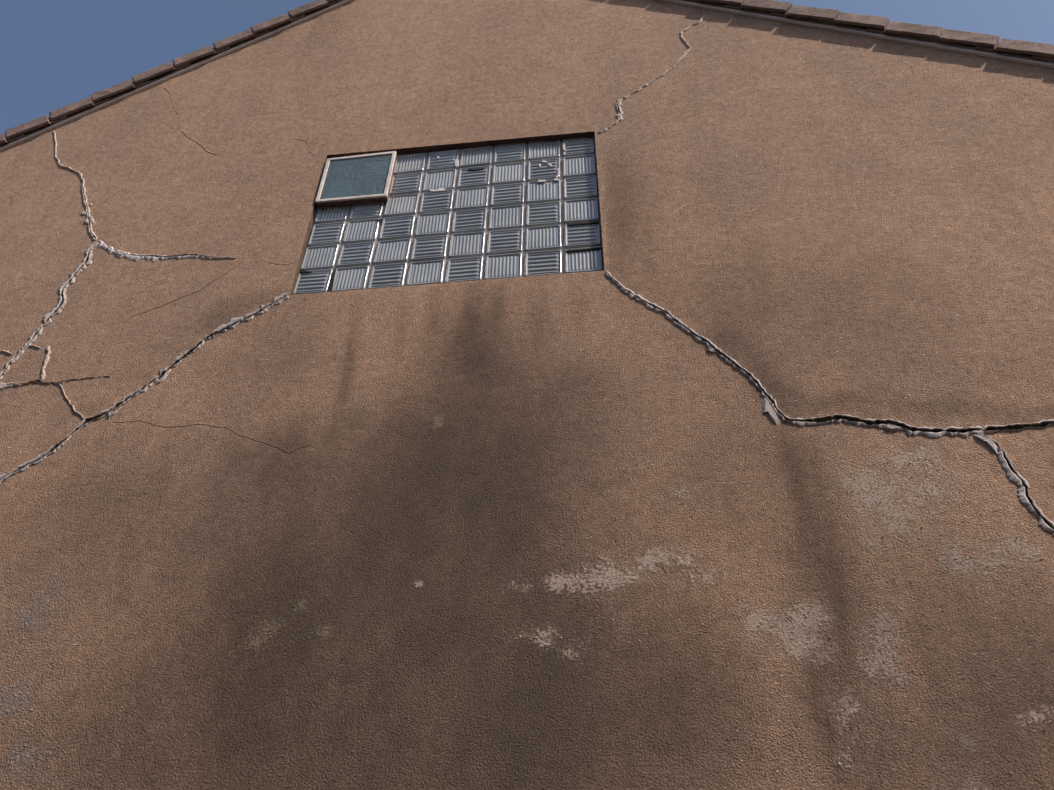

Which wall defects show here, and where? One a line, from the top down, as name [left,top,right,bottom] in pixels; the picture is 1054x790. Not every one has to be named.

crack [599,13,706,133]
crack [0,130,311,484]
crack [606,271,1054,536]
damp [256,404,622,790]